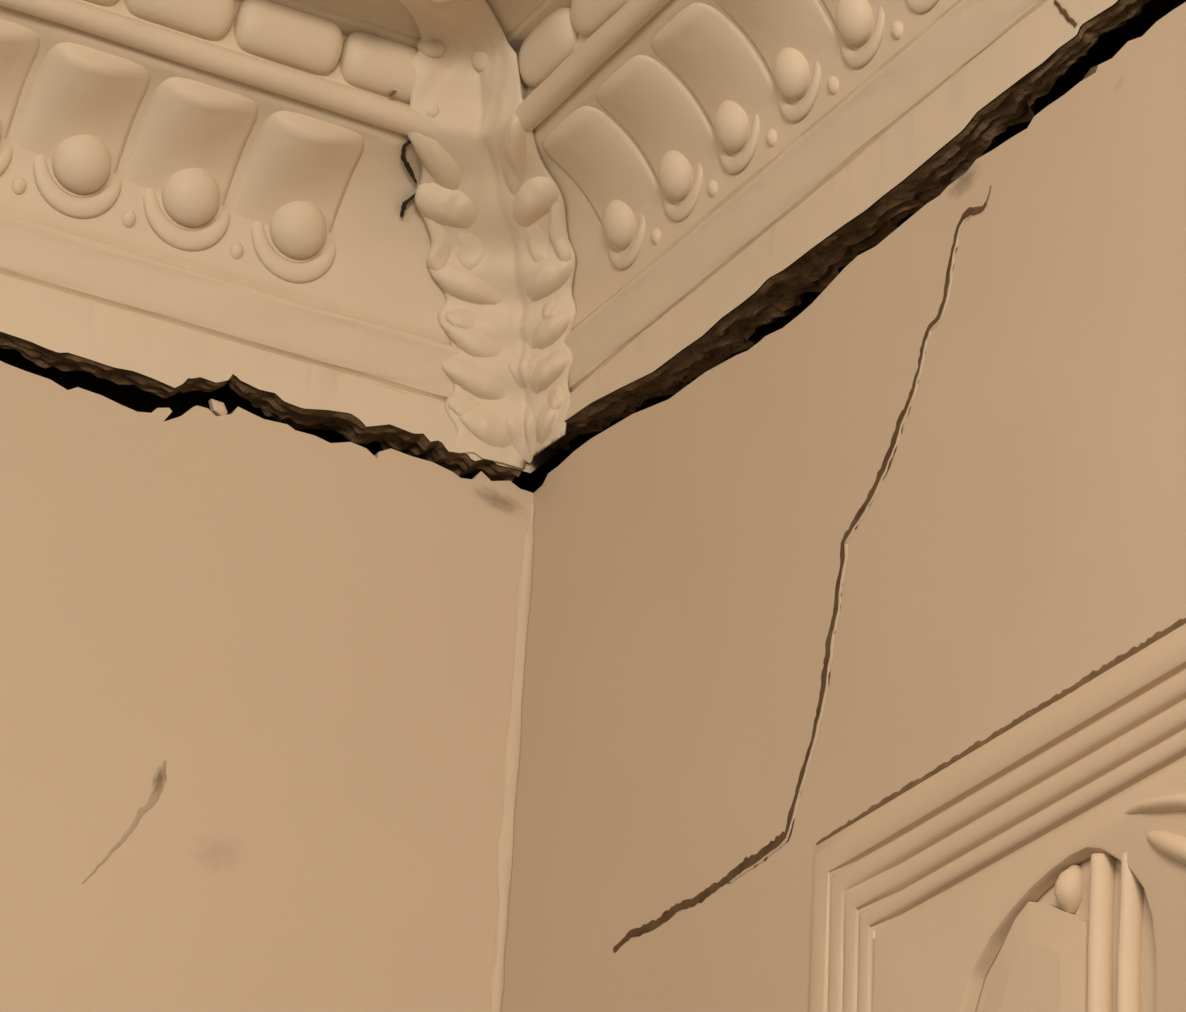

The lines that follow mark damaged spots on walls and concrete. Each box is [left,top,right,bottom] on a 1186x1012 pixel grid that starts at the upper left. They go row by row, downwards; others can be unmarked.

crack [0,0,1186,493]
crack [613,186,1186,953]